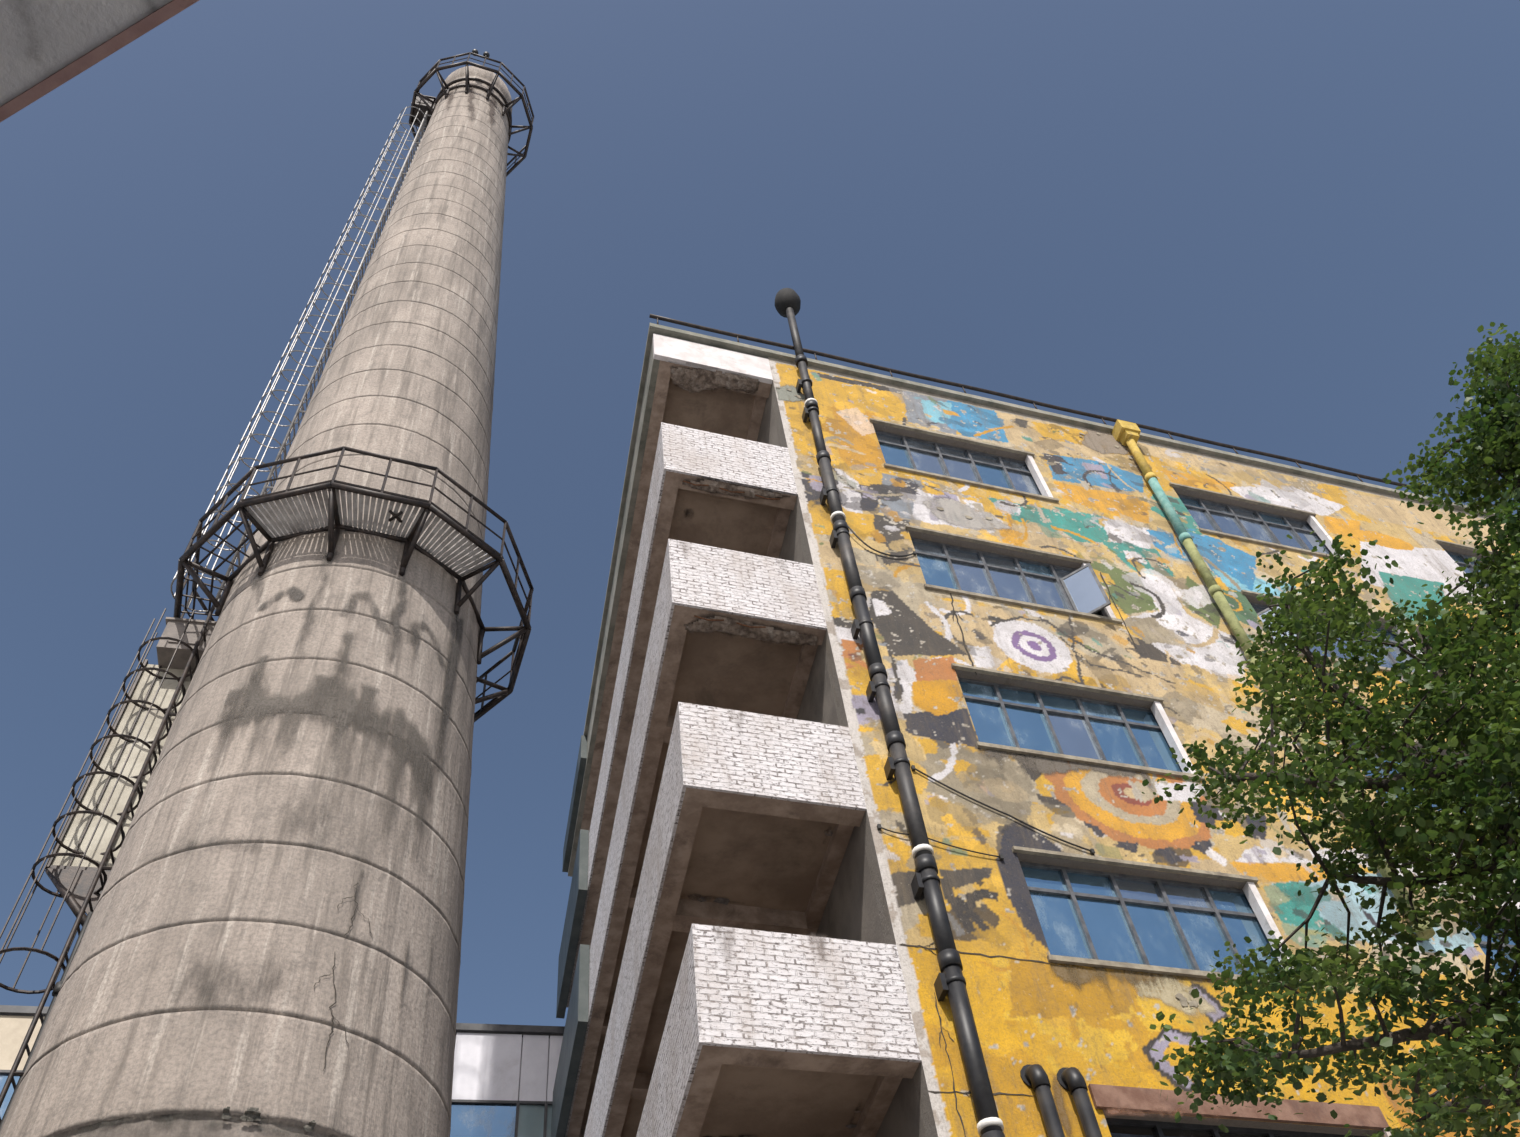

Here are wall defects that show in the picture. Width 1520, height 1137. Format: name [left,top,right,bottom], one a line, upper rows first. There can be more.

spalling [670,366,805,402]
spalling [682,478,791,500]
spalling [684,615,818,646]
damp [221,580,463,828]
crack [314,882,372,1071]